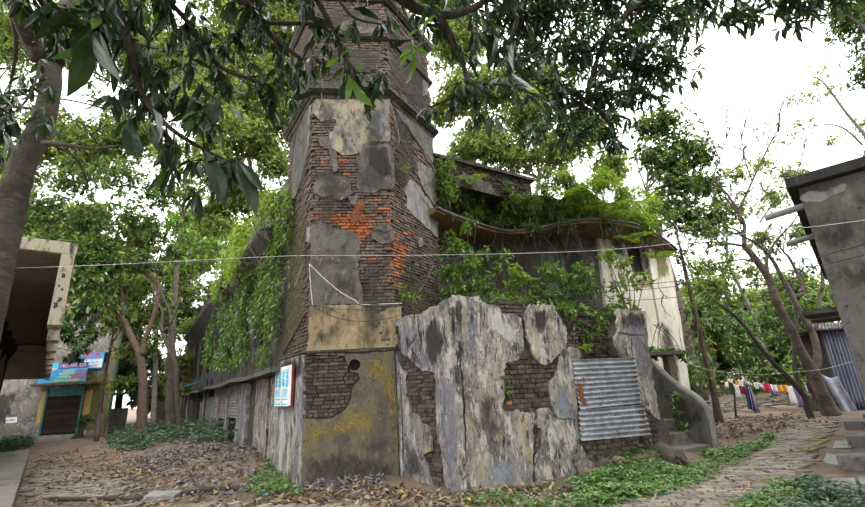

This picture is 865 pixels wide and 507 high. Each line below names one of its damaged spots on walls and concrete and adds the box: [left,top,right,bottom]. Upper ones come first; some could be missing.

flaking render [291,98,439,248]
flaking render [294,222,446,488]
spalling [500,333,578,452]
corrosion [577,377,587,405]